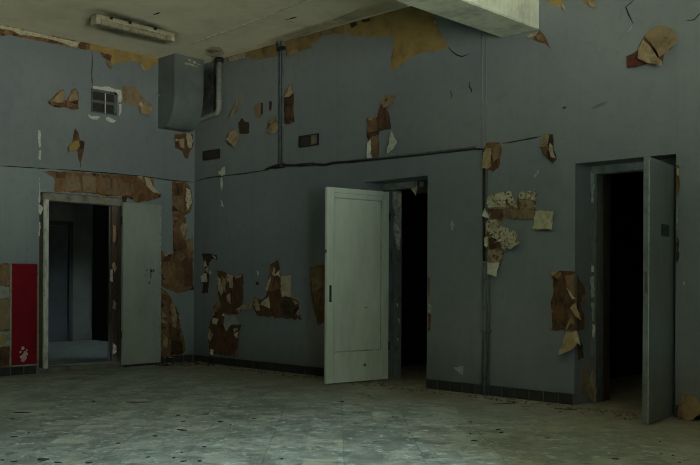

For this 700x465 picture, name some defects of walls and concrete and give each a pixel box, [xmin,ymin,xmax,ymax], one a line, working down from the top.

peeling [0,25,158,71]
peeling [226,6,448,72]
peeling [626,25,677,68]
peeling [48,88,79,110]
peeling [88,86,153,123]
peeling [254,85,295,134]
peeling [366,94,397,158]
peeling [38,129,162,236]
peeling [482,191,553,277]
peeling [161,181,302,358]
peeling [310,265,325,325]
peeling [549,266,595,360]